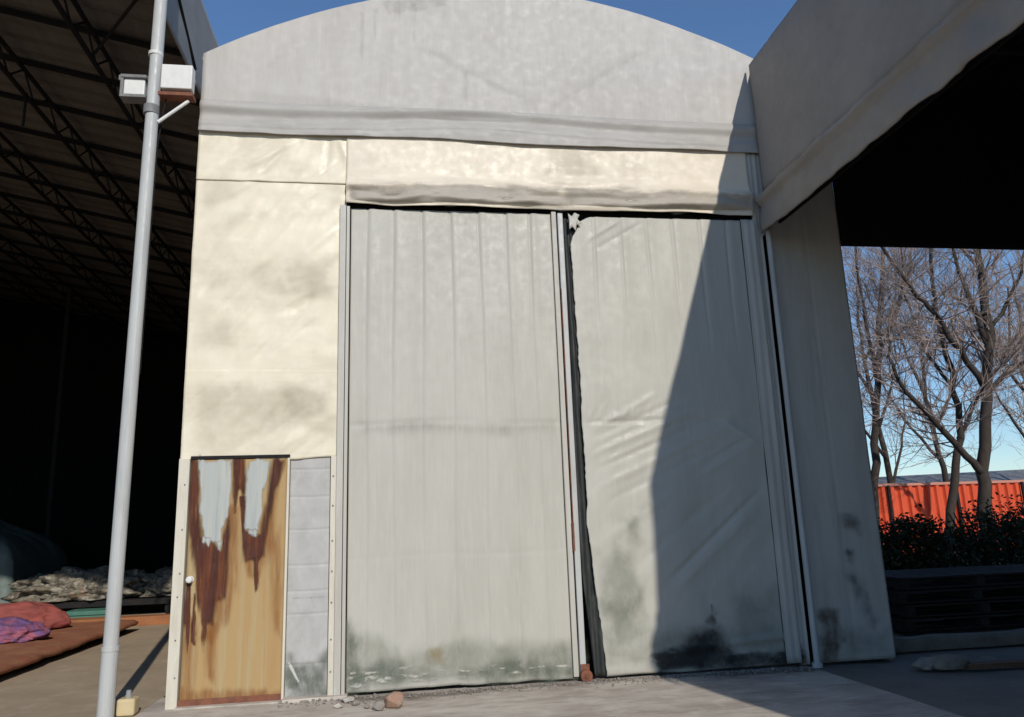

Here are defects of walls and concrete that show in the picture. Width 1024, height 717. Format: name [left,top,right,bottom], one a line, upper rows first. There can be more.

corrosion [184,458,284,649]
damp [655,616,787,676]